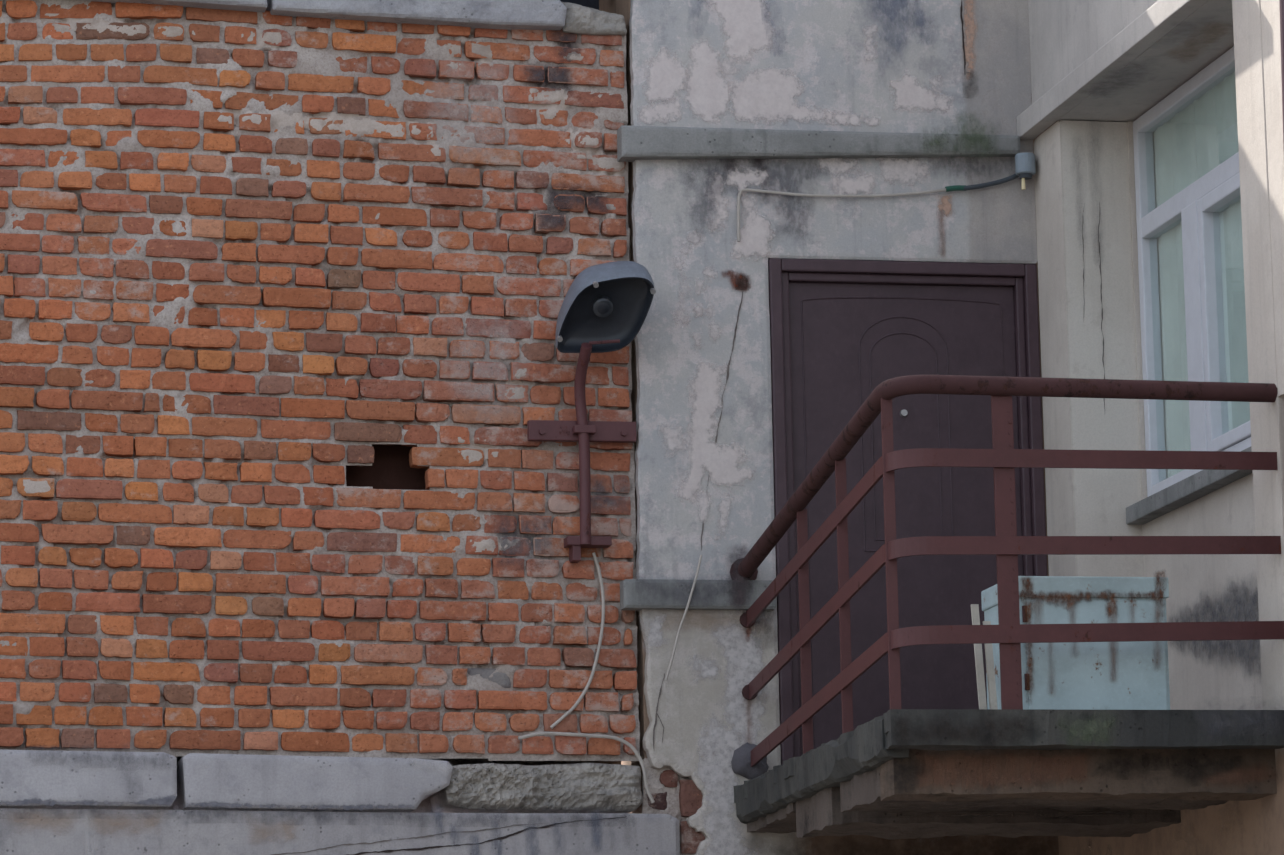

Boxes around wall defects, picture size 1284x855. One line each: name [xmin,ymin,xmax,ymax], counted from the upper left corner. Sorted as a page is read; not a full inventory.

peeling [640,0,878,126]
peeling [890,75,950,111]
spalling [960,0,976,75]
hole [346,444,428,490]
peeling [659,363,752,540]
crack [701,291,743,551]
peeling [642,622,765,855]
crack [271,816,627,855]